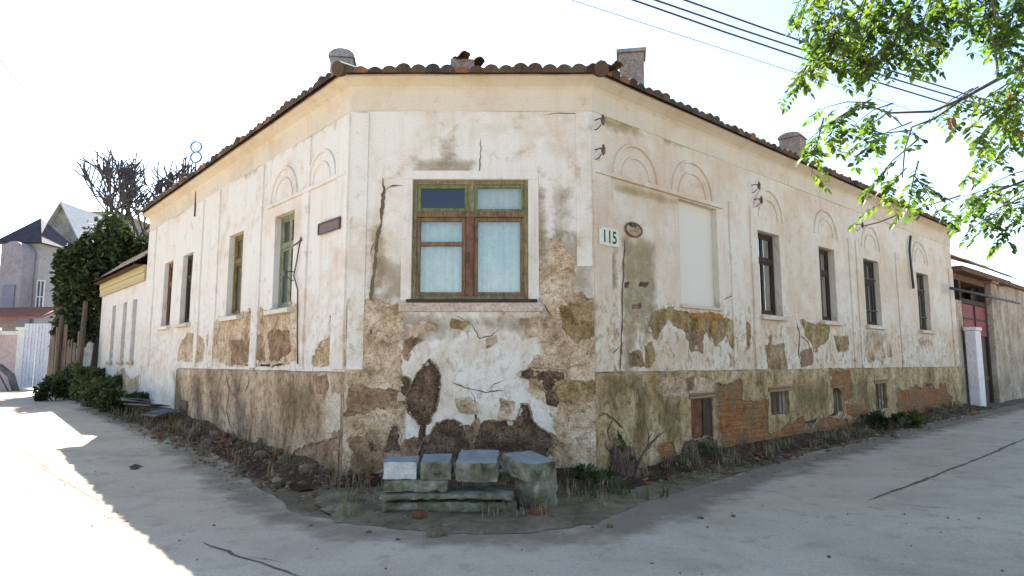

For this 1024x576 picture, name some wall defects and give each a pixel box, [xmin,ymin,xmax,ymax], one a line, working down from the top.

crack [369,178,402,301]
peeling [177,301,299,370]
peeling [293,238,597,477]
peeling [629,303,752,368]
peeling [800,318,849,367]
crack [452,380,504,419]
flaking render [657,367,871,462]
flaking render [896,382,953,417]